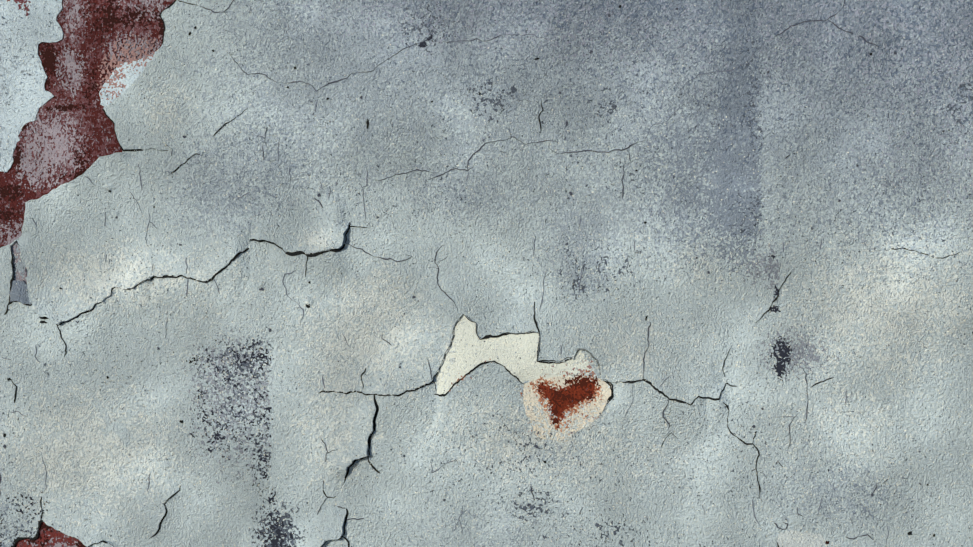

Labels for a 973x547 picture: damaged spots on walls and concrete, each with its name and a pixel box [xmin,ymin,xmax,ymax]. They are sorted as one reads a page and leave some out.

crack [159,0,234,44]
crack [776,0,881,48]
crack [231,34,539,112]
spalling [0,0,175,285]
crack [0,51,847,547]
corrosion [520,367,603,432]
spalling [14,522,86,547]